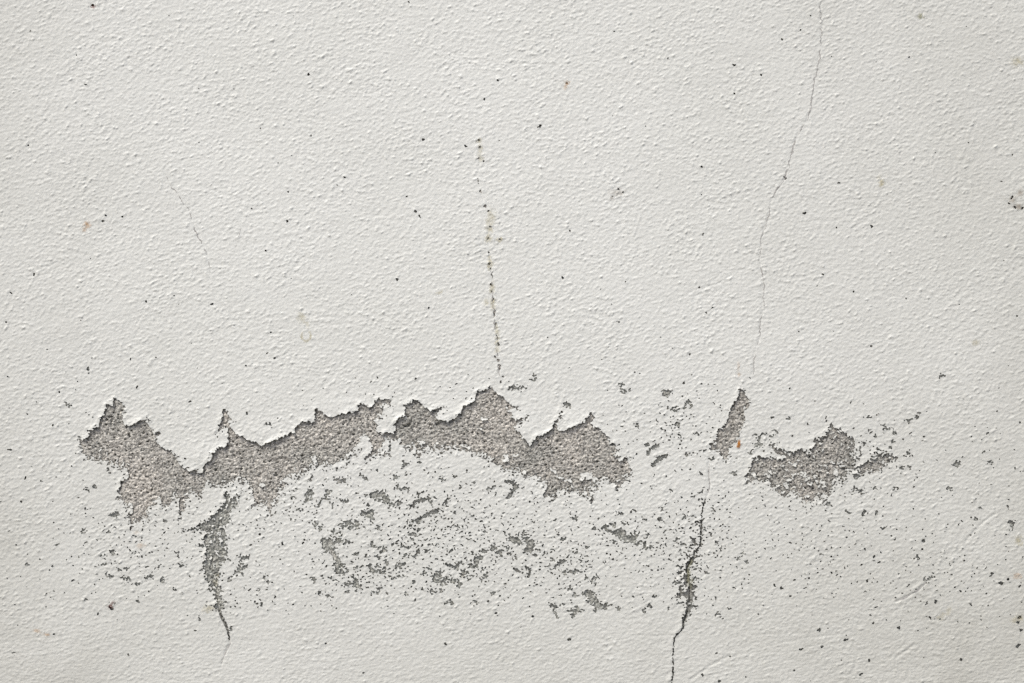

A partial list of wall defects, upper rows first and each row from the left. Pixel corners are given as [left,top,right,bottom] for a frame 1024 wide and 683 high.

crack [476,139,504,383]
crack [753,3,823,374]
peeling [77,373,634,619]
crack [671,464,710,683]
peeling [660,388,912,530]